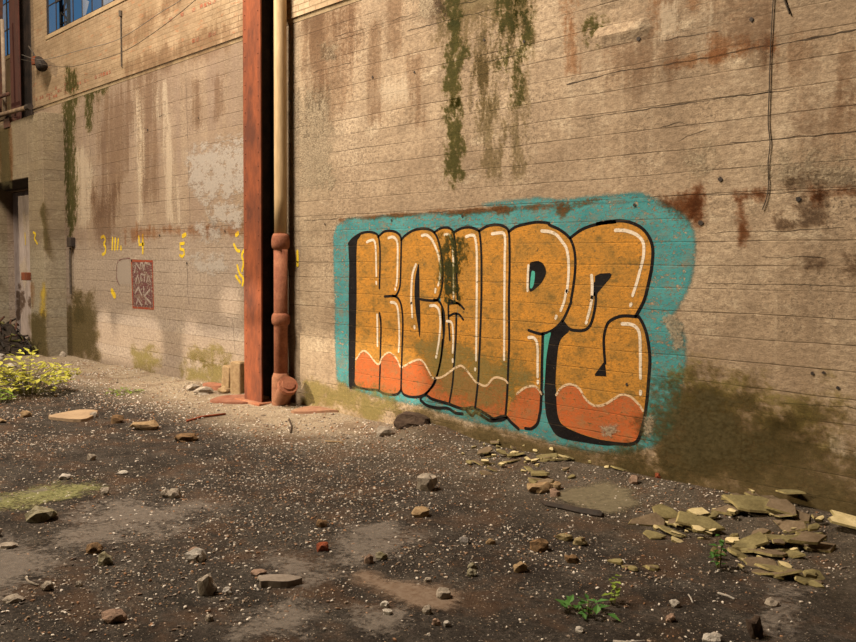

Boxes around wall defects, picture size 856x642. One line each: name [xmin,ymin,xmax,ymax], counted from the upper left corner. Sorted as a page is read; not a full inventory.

leakage [85,88,105,131]
leakage [443,21,469,186]
leakage [499,16,532,104]